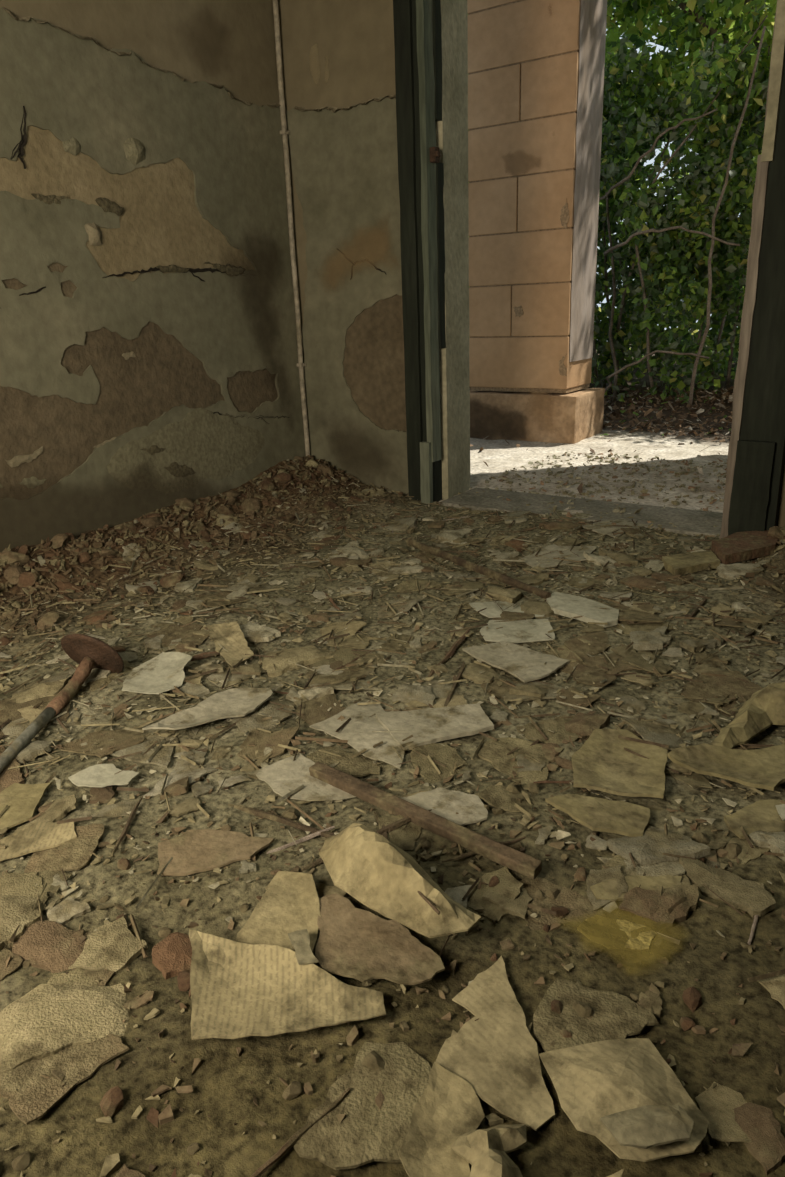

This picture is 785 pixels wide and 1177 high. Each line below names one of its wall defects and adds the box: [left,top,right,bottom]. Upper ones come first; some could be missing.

crack [11,106,27,169]
crack [104,267,256,281]
peeling [0,7,409,553]